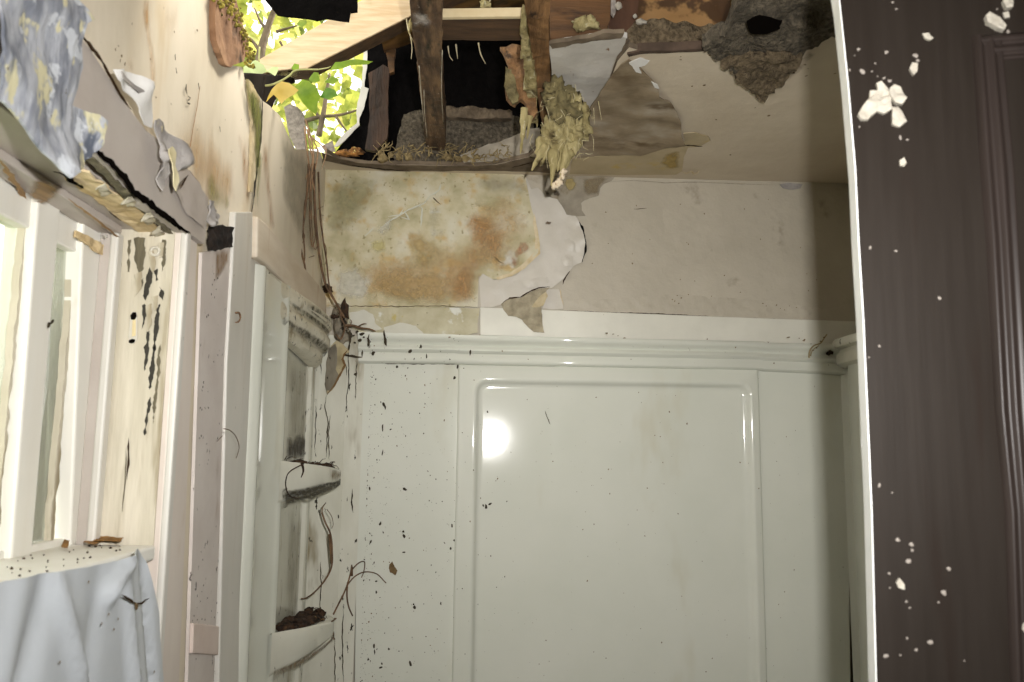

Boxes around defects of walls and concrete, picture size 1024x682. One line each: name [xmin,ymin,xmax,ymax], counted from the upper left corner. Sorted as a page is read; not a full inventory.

crack [83,37,132,110]
peeling [113,69,195,191]
peeling [0,0,173,436]
crack [68,198,120,238]
crack [96,150,190,233]
spalling [206,200,234,251]
flaking render [322,169,614,335]
leakage [322,132,710,249]
peeling [122,438,130,510]